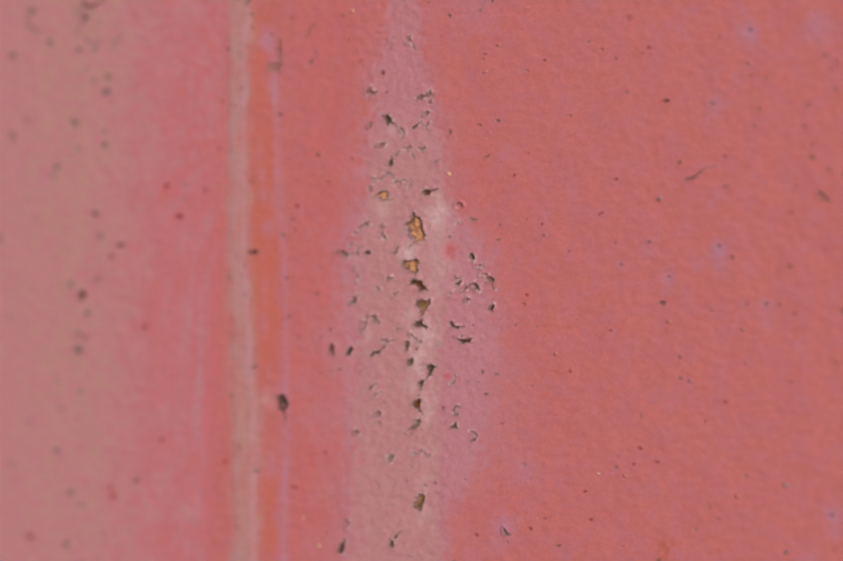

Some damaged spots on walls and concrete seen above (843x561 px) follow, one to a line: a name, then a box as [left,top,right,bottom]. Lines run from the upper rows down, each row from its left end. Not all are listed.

peeling [420,187,440,198]
peeling [391,210,433,330]
peeling [453,251,497,304]
peeling [327,313,383,357]
peeling [447,320,473,345]
peeling [404,339,438,437]
peeling [413,491,426,513]